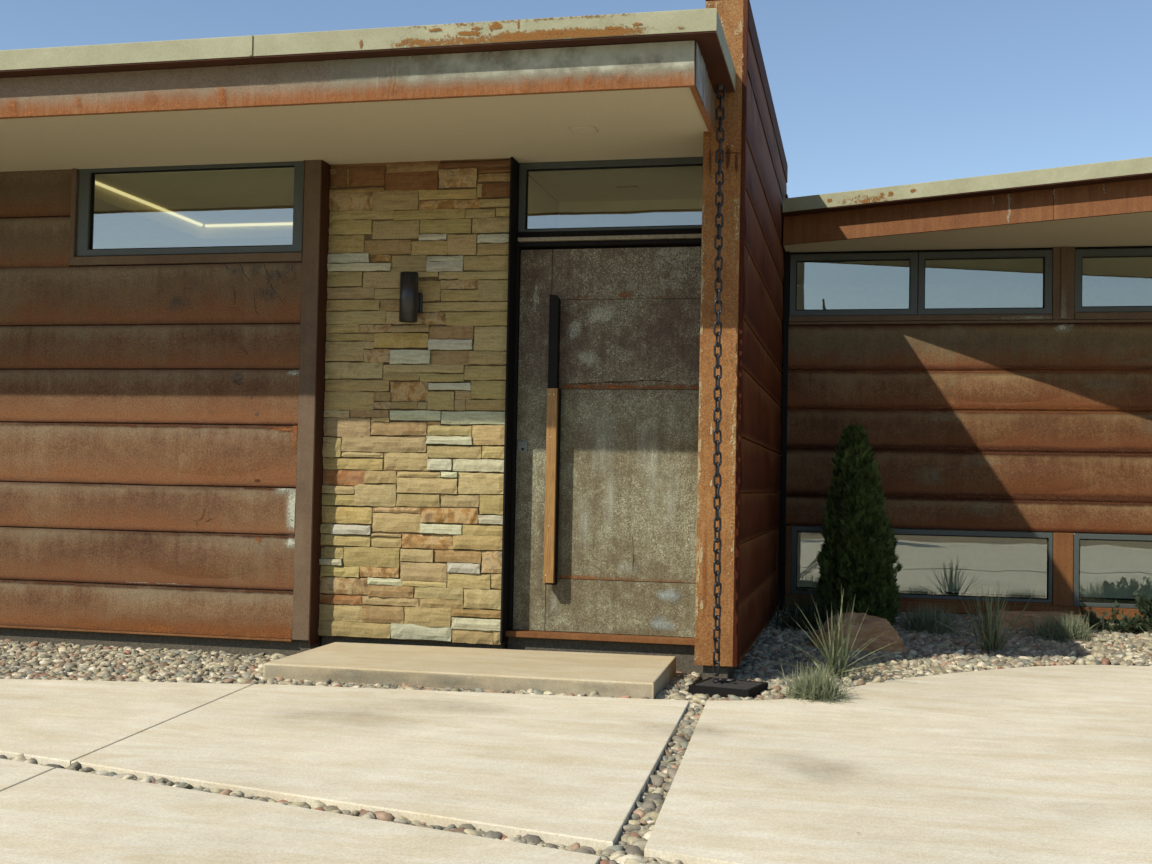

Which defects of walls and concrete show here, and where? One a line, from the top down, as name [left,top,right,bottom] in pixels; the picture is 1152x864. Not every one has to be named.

rust [827,191,894,205]
rust [19,421,297,444]
rust [870,445,1152,457]
rust [188,479,296,490]
rust [883,493,1152,506]
rust [126,529,294,541]
rust [1,578,293,594]